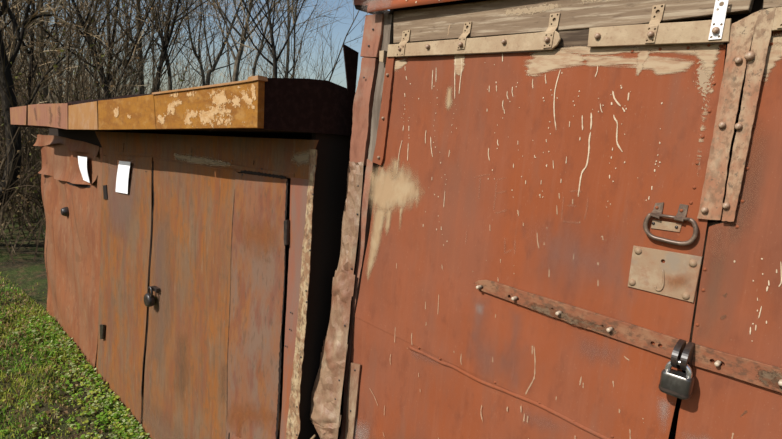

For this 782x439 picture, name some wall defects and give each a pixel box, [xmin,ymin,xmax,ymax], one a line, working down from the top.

peeling [454,54,465,75]
peeling [157,84,256,127]
peeling [526,44,721,142]
peeling [370,168,419,214]
rust [755,367,782,391]